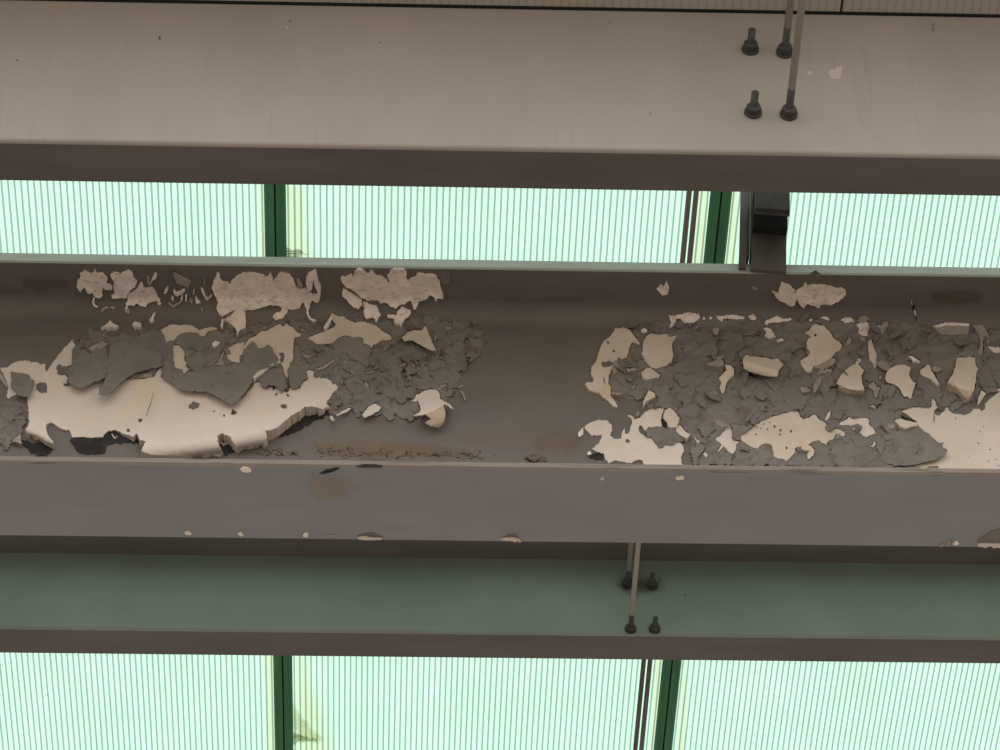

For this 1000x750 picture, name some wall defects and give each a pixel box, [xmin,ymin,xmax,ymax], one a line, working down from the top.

peeling [0,267,487,459]
peeling [578,270,1000,480]
peeling [357,532,383,540]
peeling [500,533,521,542]
peeling [977,528,1000,548]